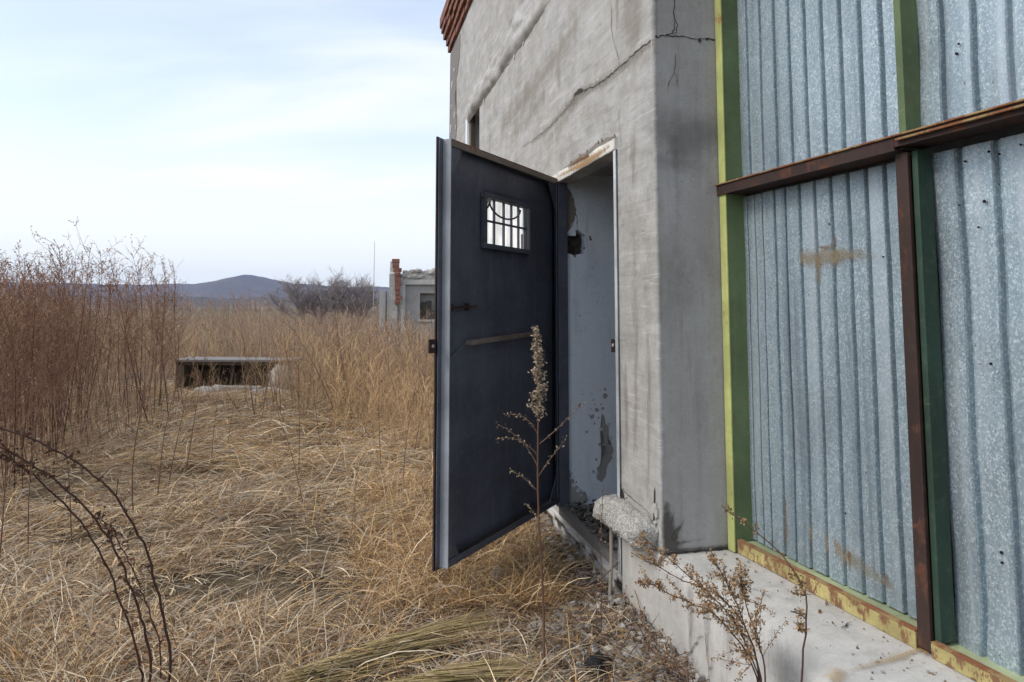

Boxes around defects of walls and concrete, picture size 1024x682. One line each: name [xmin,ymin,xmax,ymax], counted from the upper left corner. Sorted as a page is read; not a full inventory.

crack [526,0,715,145]
spalling [564,134,616,168]
peeling [578,388,614,482]